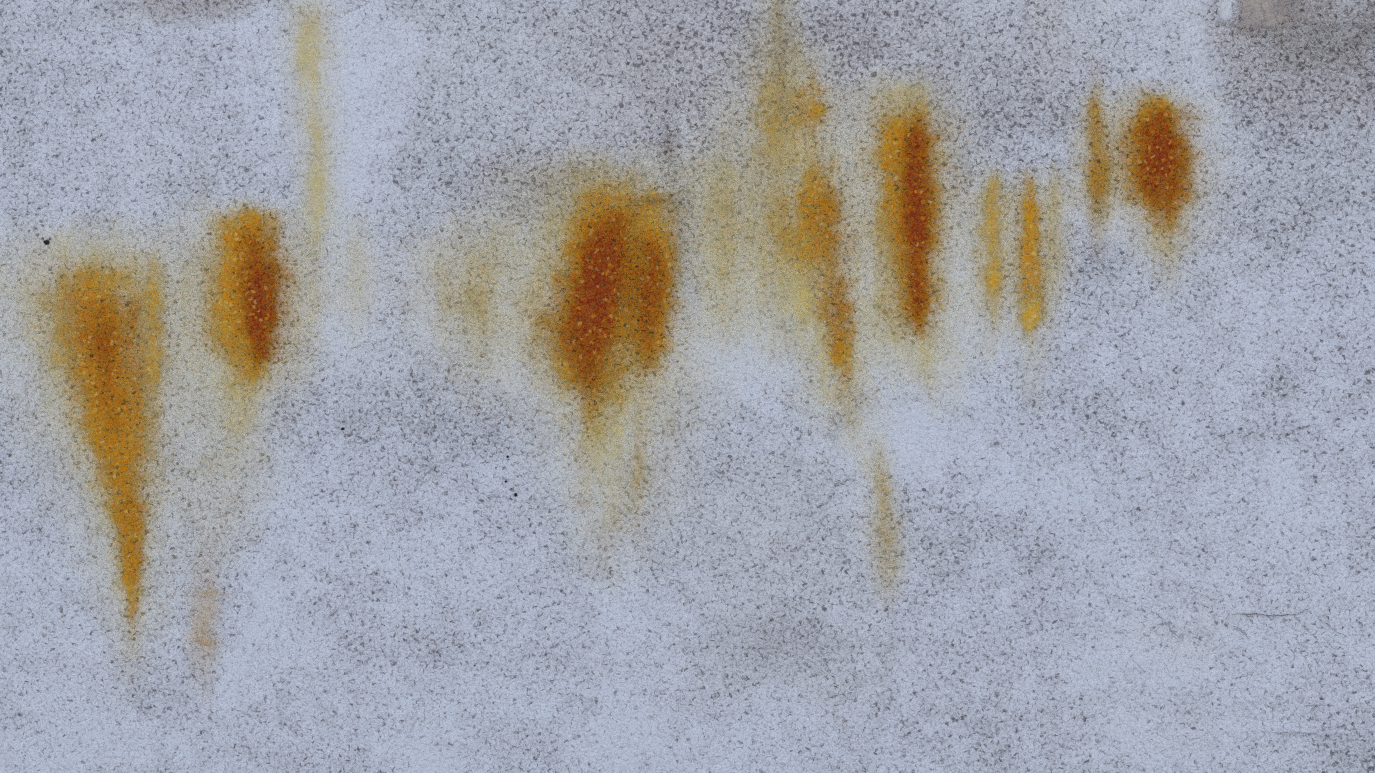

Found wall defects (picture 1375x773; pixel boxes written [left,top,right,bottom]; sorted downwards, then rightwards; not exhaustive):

corrosion [26,241,165,629]
corrosion [202,207,296,440]
corrosion [524,171,680,499]
corrosion [752,40,862,400]
corrosion [869,85,945,379]
corrosion [977,173,1059,332]
corrosion [1083,94,1195,250]